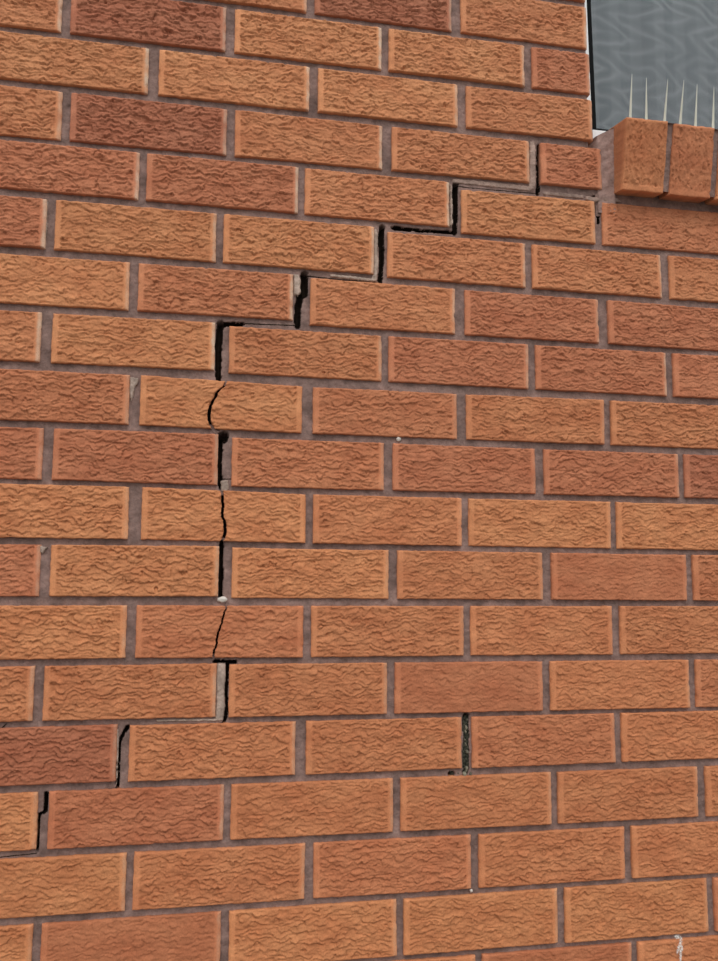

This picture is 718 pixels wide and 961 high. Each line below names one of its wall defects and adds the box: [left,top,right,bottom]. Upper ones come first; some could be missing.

crack [207,147,540,723]
crack [108,725,130,789]
crack [0,791,49,858]